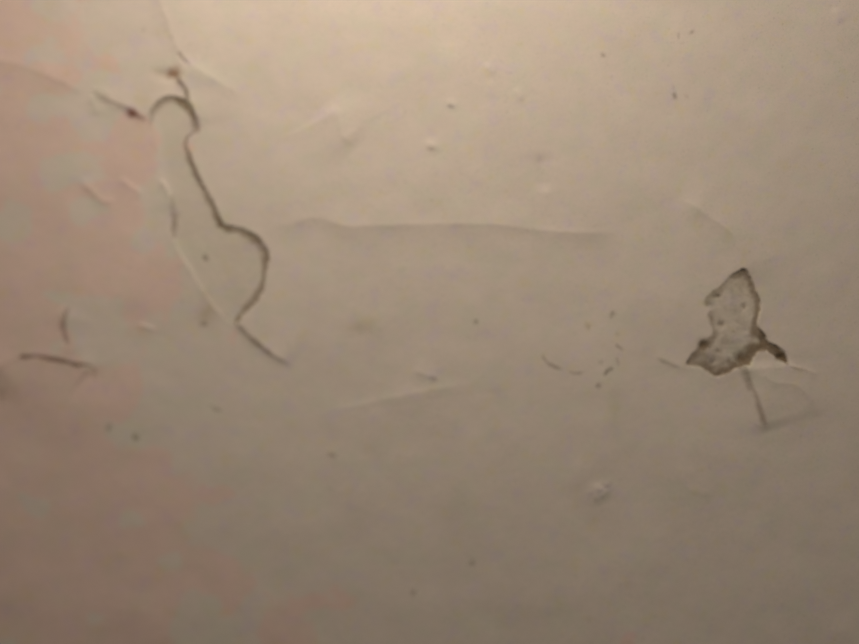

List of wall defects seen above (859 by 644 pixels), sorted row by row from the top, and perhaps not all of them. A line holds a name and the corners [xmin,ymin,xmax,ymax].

peeling [87,74,277,335]
flaking render [686,258,796,384]